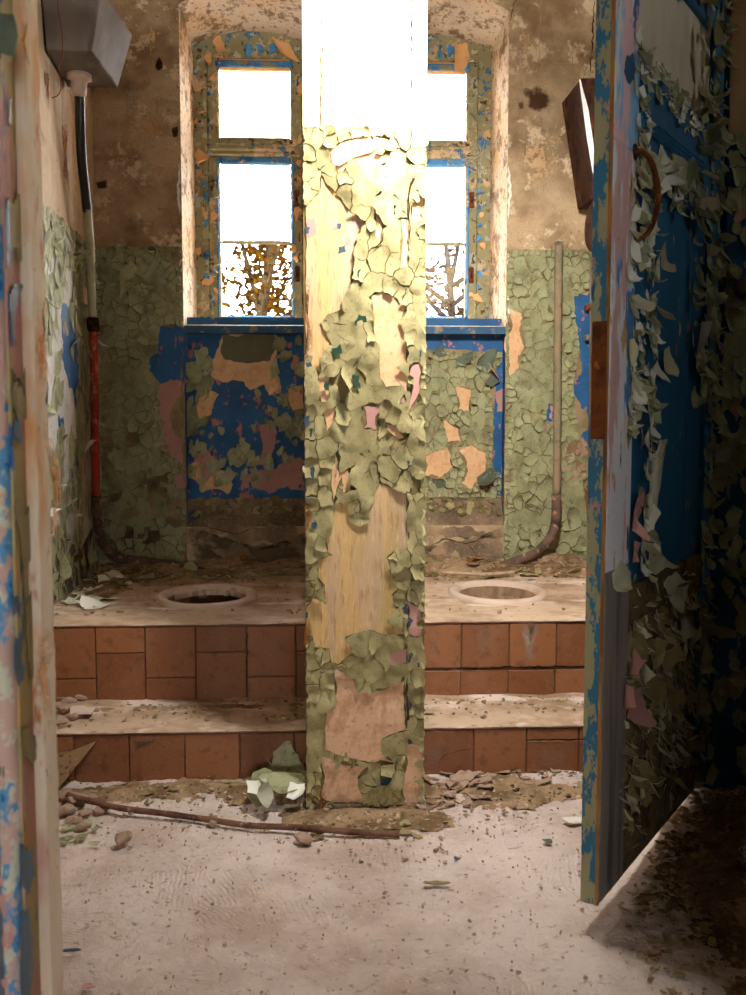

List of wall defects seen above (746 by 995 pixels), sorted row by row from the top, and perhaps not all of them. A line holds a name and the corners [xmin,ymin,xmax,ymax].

peeling [0,13,18,59]
water stain [526,87,548,111]
water stain [522,125,563,192]
peeling [5,193,22,270]
peeling [42,178,364,609]
peeling [355,249,592,561]
peeling [612,0,746,848]
peeling [13,500,31,570]
peeling [13,591,34,686]
peeling [293,442,562,809]
peeling [20,724,36,766]
peeling [0,877,33,995]